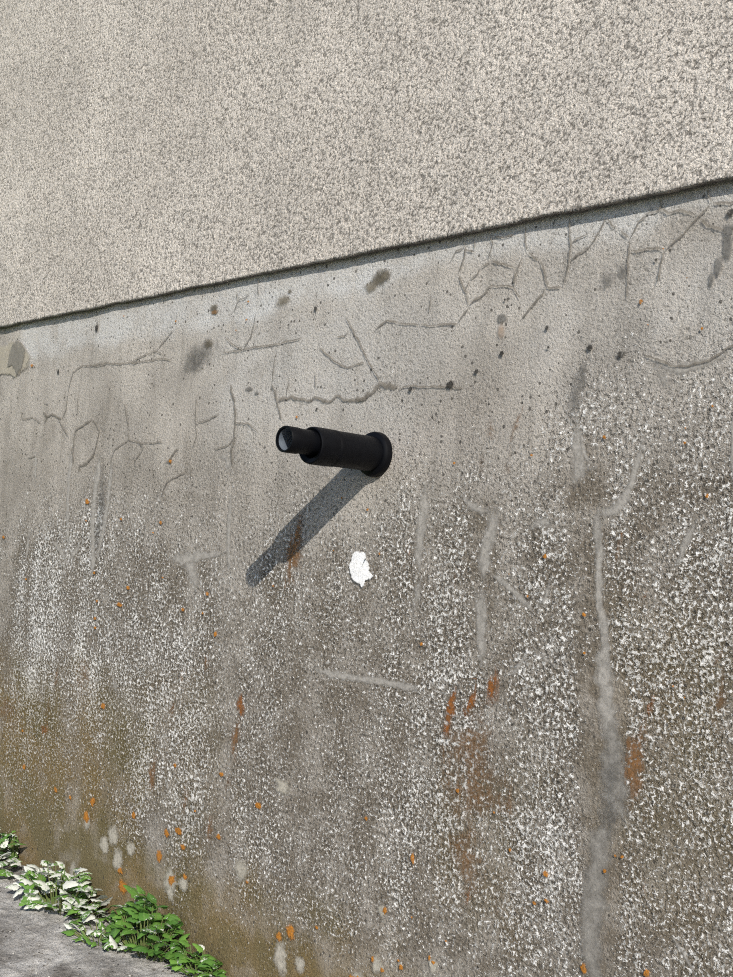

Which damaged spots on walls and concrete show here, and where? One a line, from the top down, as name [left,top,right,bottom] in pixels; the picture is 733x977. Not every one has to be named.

crack [223,190,733,419]
peeling [0,341,29,377]
crack [20,330,257,496]
water stain [572,424,596,480]
corrosion [287,519,301,576]
water stain [317,668,416,690]
water stain [581,442,643,977]